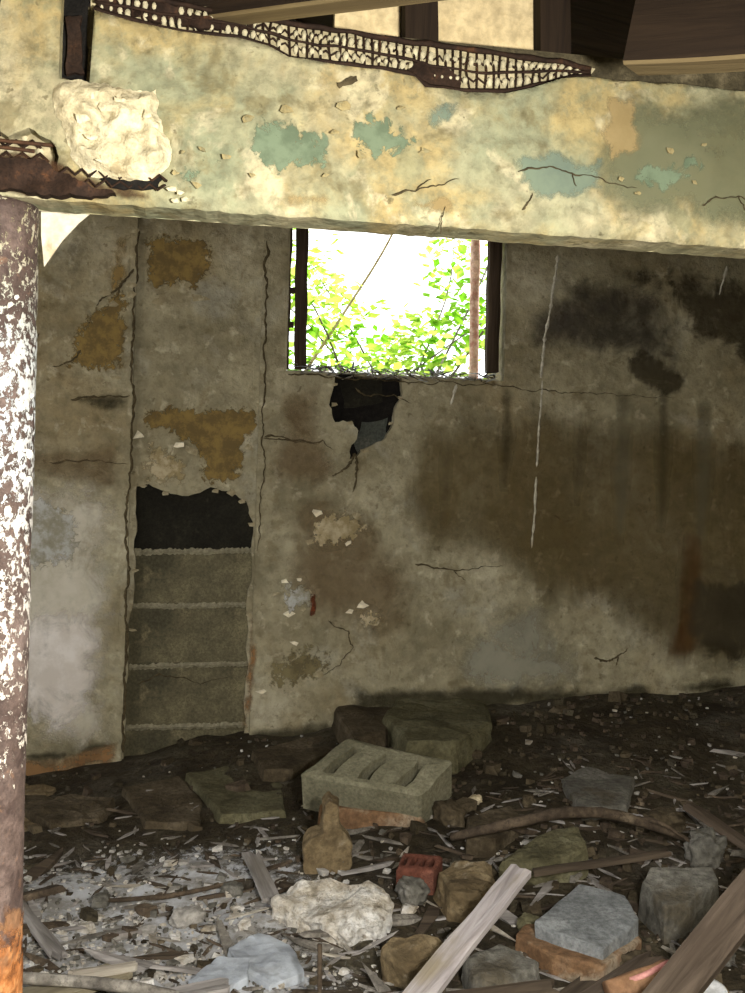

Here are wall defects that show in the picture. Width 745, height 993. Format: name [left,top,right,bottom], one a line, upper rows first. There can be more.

flaking render [62,0,595,93]
peeling [242,105,339,177]
crack [518,166,636,210]
peeling [519,97,638,199]
peeling [0,134,220,789]
flaking render [329,374,402,491]
crack [257,241,670,551]
leakage [418,255,745,660]
leakage [27,485,111,755]
flaking render [124,403,330,756]
leakage [357,610,575,707]
rust [0,909,24,993]